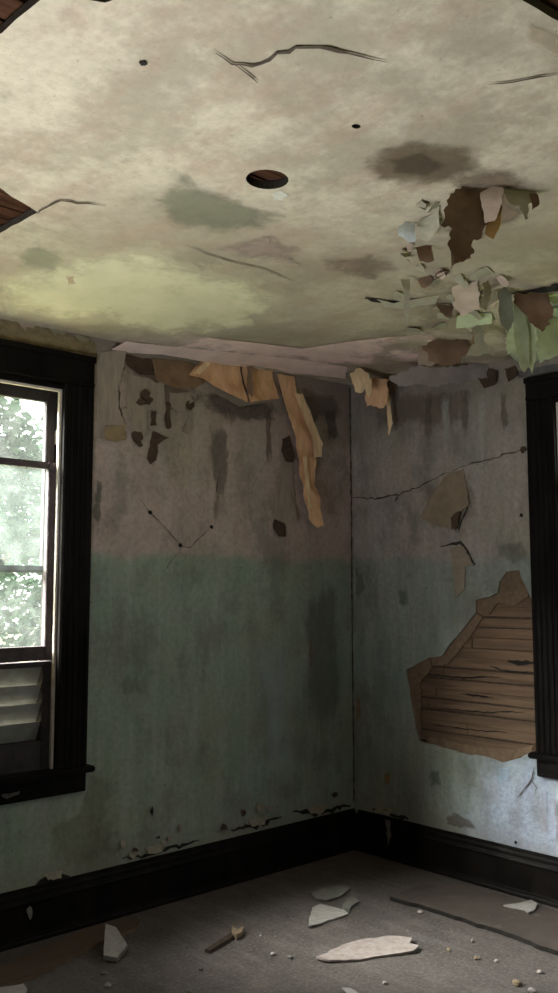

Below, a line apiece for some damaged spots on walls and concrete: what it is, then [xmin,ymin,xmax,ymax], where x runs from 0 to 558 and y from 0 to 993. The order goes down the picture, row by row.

crack [215,47,385,83]
crack [37,200,105,214]
leakage [167,180,267,228]
leakage [375,145,521,223]
peeling [399,243,508,346]
peeling [505,293,558,378]
peeling [122,389,160,442]
peeling [277,374,324,528]
crack [349,388,520,801]
flaking render [408,570,536,762]
flaking render [120,824,198,860]